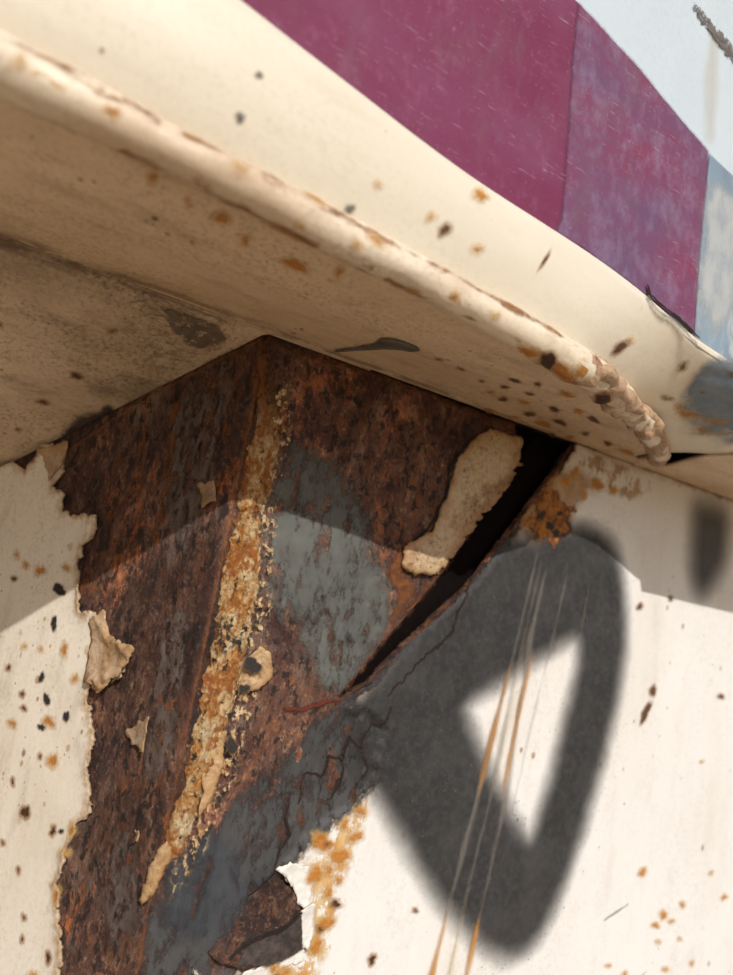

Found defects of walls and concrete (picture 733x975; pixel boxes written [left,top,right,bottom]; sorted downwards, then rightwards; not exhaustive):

rust [307,192,394,245]
rust [468,282,562,337]
rust [613,339,633,354]
peeling [13,299,523,630]
rust [521,456,640,548]
rust [37,693,69,731]
peeling [83,551,146,725]
peeling [116,389,259,843]
rust [46,338,599,975]
crack [274,429,568,875]
rust [641,684,656,724]
peeling [138,778,365,975]